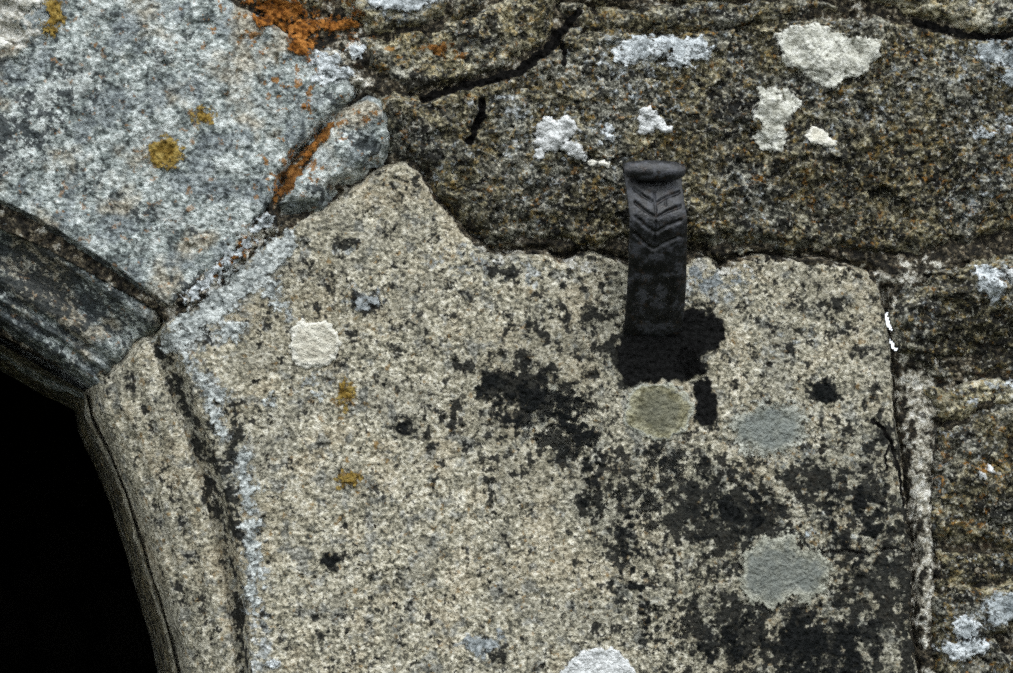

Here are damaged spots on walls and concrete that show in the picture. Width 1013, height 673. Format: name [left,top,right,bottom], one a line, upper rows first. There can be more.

crack [871,419,905,506]